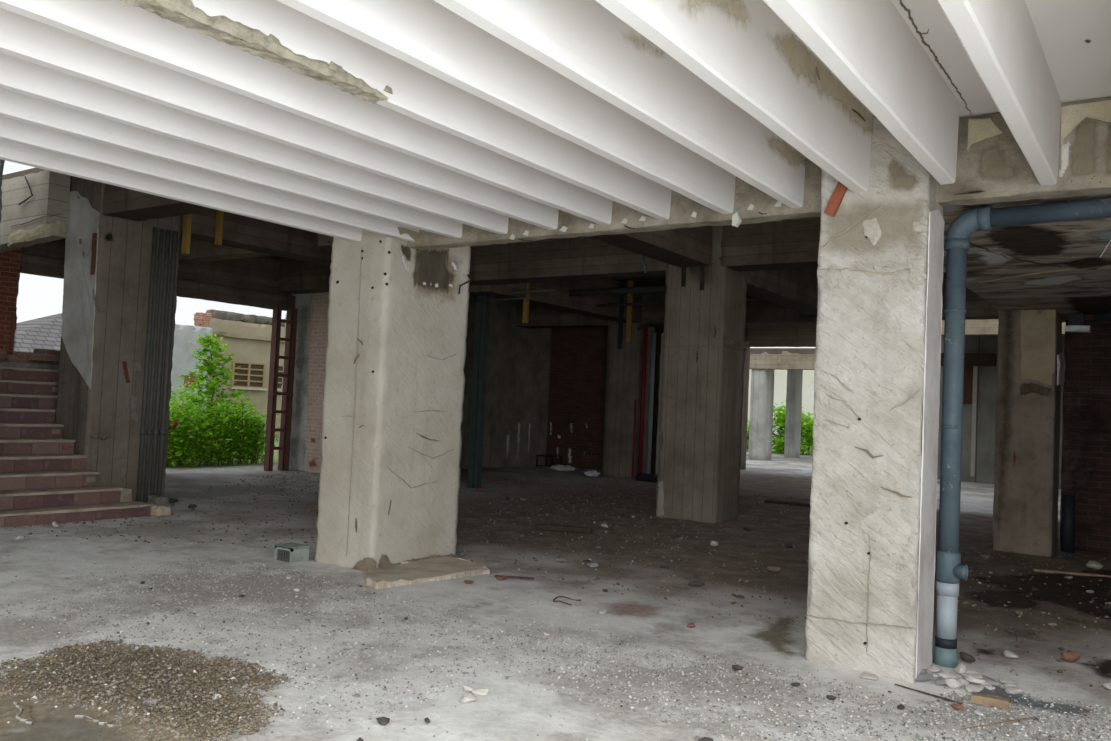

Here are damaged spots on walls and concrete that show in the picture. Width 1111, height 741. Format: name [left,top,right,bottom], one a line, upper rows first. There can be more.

spalling [120,0,393,104]
crack [899,0,972,115]
flaking render [967,118,1003,151]
flaking render [1059,100,1111,177]
damp [985,226,1111,270]